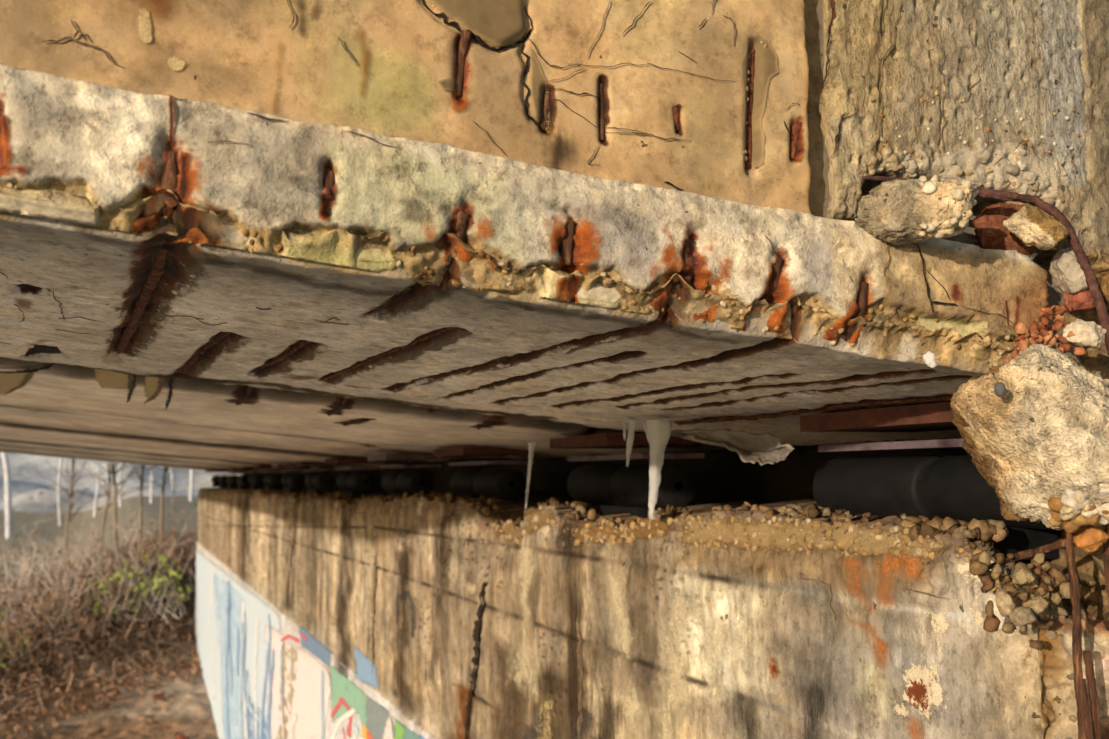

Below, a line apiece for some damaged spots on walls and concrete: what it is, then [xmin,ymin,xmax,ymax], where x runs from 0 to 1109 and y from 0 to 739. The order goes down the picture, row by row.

corrosion [0,92,26,175]
corrosion [131,96,212,235]
spalling [75,191,972,430]
corrosion [550,216,602,303]
crack [522,0,736,165]
corrosion [648,223,731,324]
spalling [789,116,804,162]
spalling [862,100,1109,355]
water stain [393,550,412,712]
water stain [509,535,553,739]
water stain [565,590,700,739]
spalling [571,514,1109,739]